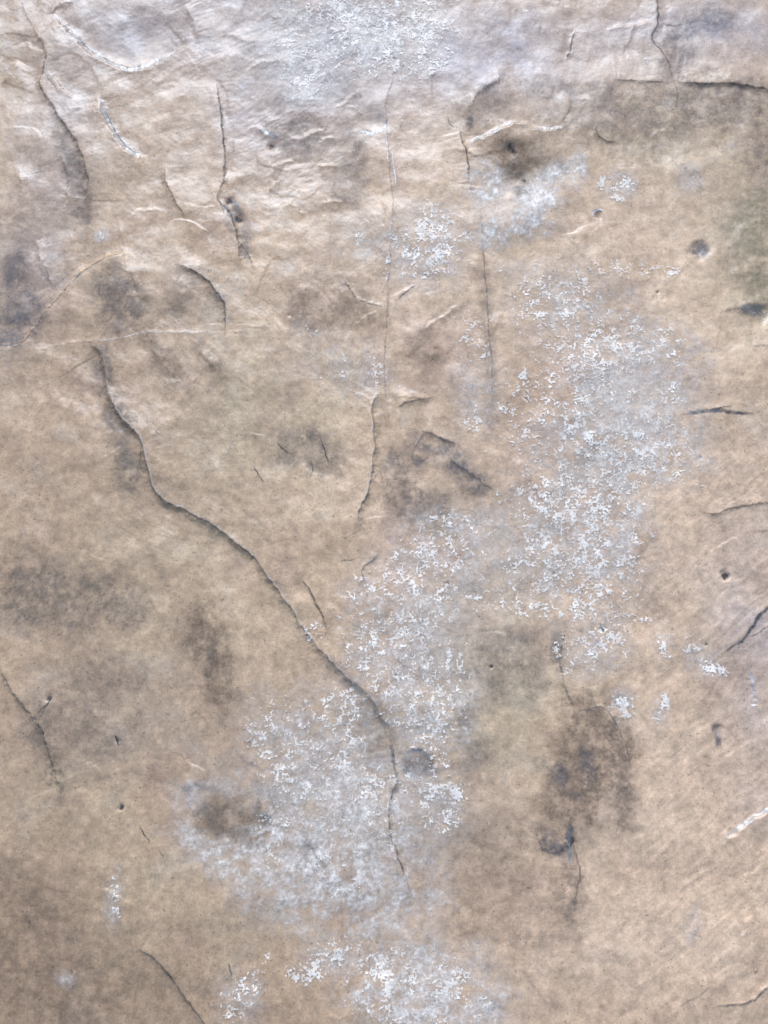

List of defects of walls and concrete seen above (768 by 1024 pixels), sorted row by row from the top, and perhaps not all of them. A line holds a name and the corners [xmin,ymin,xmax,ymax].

water stain [597,174,639,203]
water stain [378,155,586,284]
crack [689,406,743,414]
water stain [175,260,709,1024]
water stain [657,634,728,677]
crack [728,607,768,650]